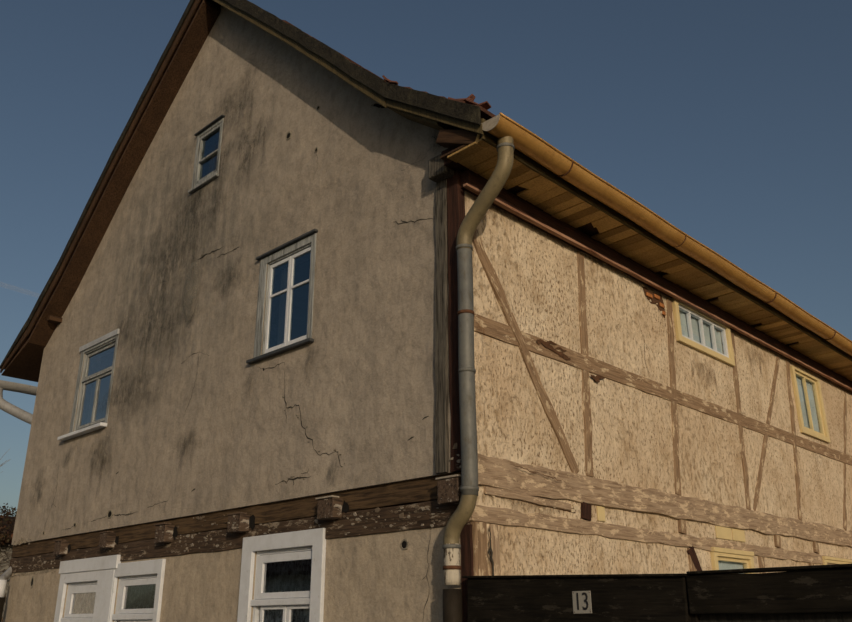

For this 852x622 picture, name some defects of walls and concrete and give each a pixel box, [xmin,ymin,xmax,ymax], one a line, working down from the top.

crack [260,362,345,485]
crack [44,475,166,530]
peeling [174,515,239,552]
peeling [343,501,440,535]